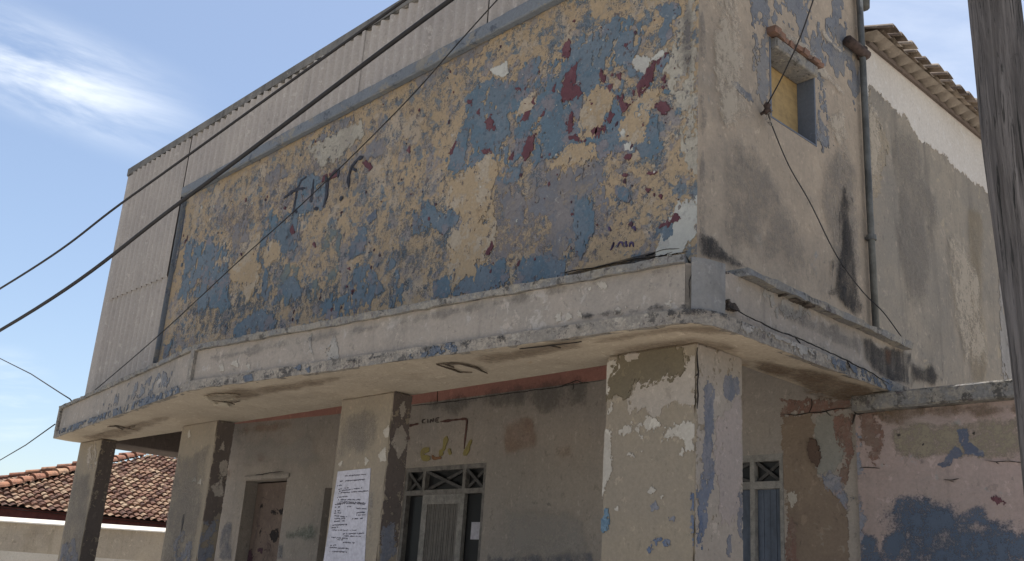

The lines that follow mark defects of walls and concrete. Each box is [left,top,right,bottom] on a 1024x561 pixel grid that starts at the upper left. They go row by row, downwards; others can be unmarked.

peeling [173,116,405,338]
peeling [378,0,699,299]
leakage [830,189,862,313]
peeling [731,0,988,225]
peeling [59,339,179,434]
peeling [365,392,412,561]
peeling [601,343,743,561]
leakage [865,339,938,385]
spalling [779,397,1024,561]